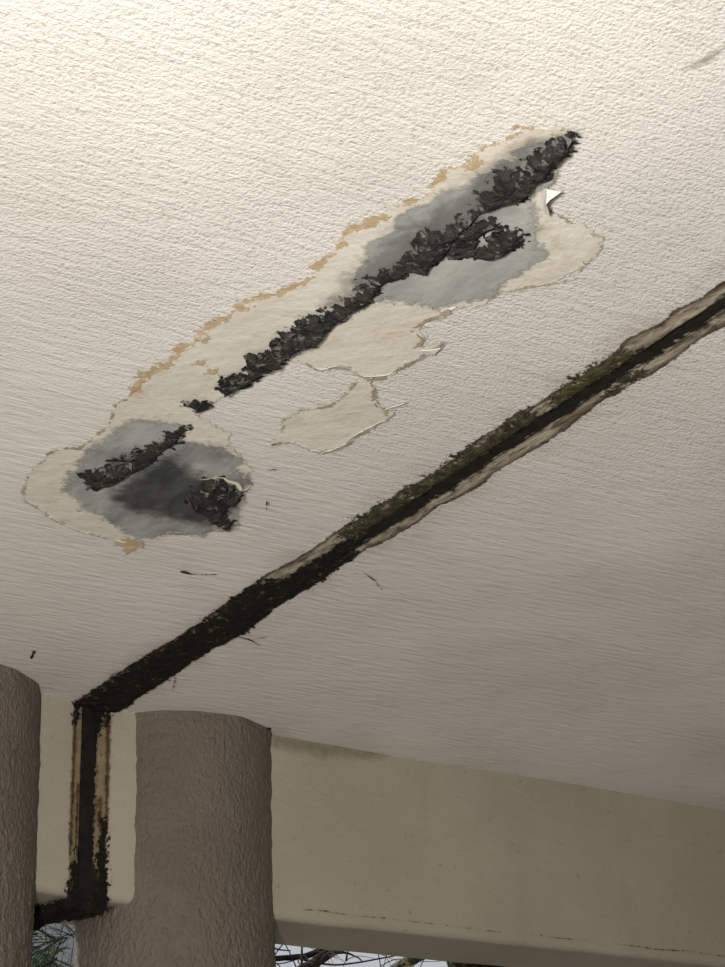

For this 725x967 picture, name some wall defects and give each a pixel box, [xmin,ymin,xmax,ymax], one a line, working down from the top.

crack [76,424,193,492]
peeling [20,125,604,555]
crack [212,130,581,397]
leakage [351,135,573,310]
leakage [33,294,725,931]